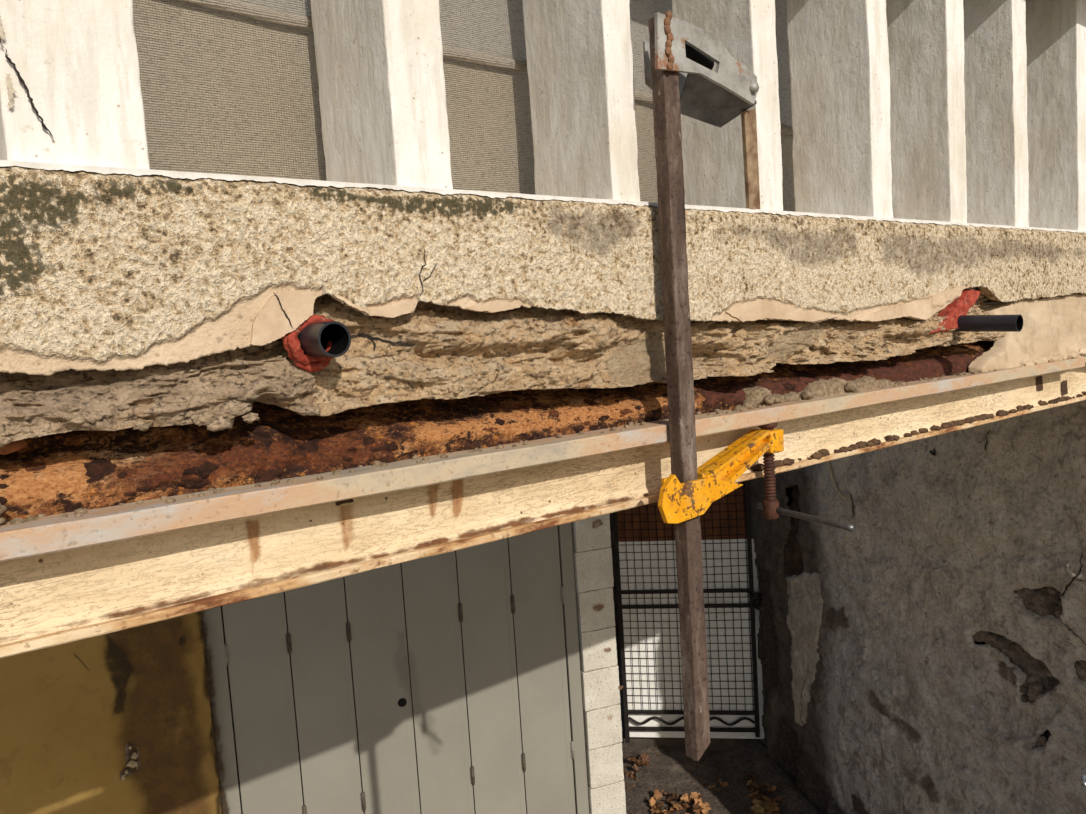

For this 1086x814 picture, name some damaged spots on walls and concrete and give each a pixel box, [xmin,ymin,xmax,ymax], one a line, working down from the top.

crack [0,38,54,140]
spalling [0,290,667,448]
rust [697,351,983,407]
spalling [690,285,1005,380]
rust [414,395,668,444]
rust [0,427,398,509]
rust [452,480,463,515]
flaking render [1013,586,1063,618]
flaking render [972,630,1060,703]
flaking render [1074,660,1086,682]
leakage [106,611,229,814]